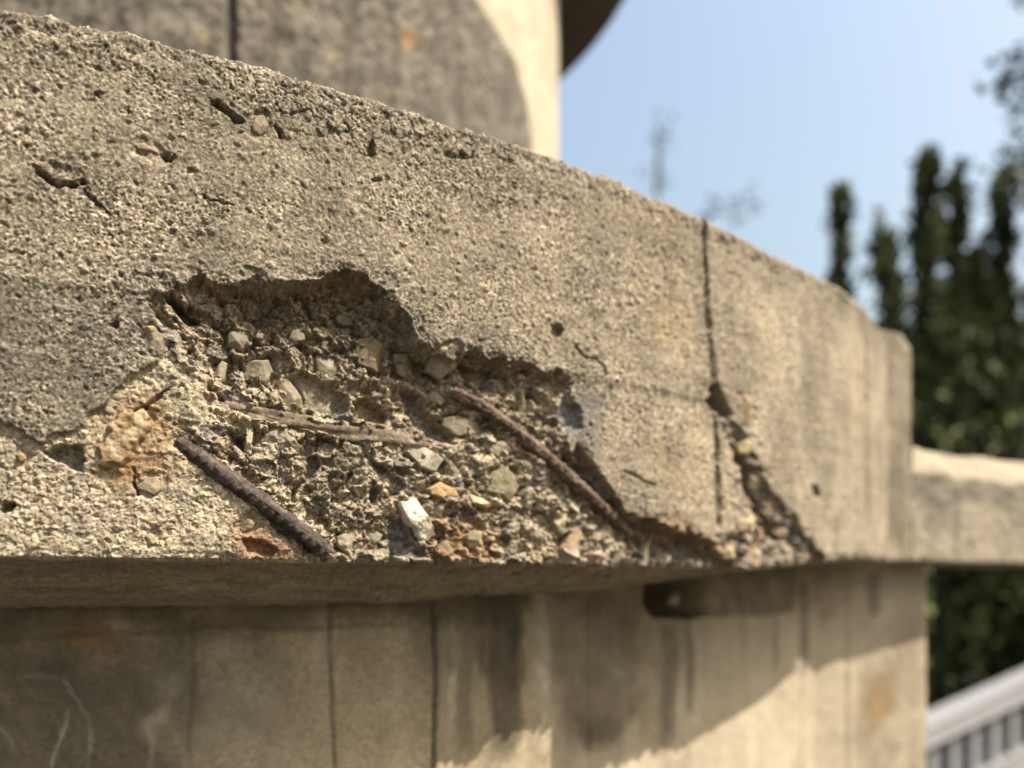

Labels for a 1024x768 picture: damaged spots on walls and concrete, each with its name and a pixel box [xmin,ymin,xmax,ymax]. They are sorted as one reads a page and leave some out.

corrosion [243,534,278,556]
spalling [0,268,797,620]
crack [693,218,826,568]